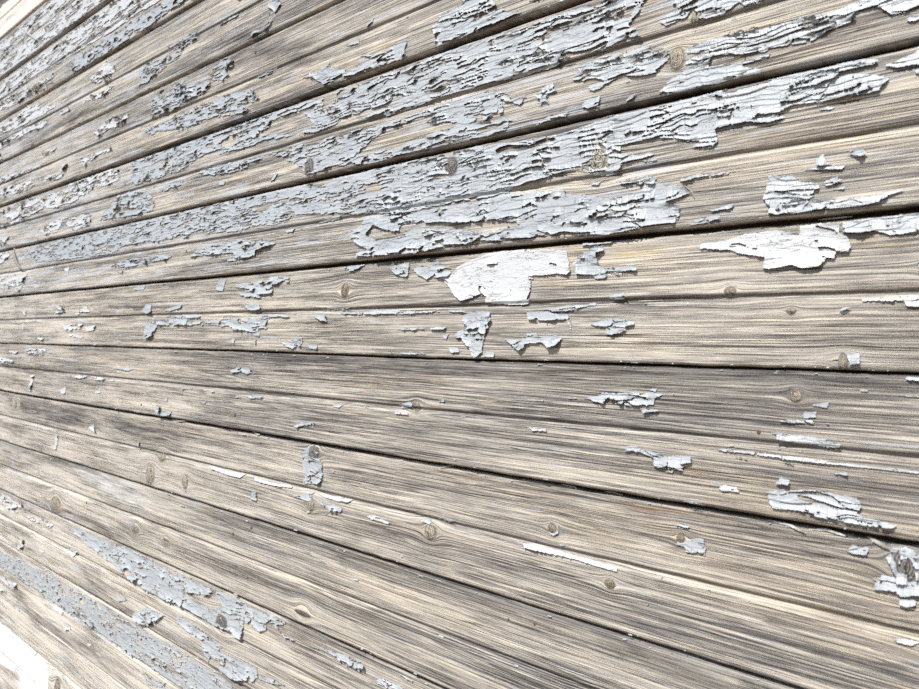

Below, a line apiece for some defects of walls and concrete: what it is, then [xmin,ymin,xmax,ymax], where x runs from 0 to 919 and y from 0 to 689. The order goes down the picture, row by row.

peeling [0,0,919,358]
peeling [0,337,46,364]
peeling [75,367,134,394]
peeling [569,388,662,414]
peeling [845,352,860,364]
peeling [774,402,841,448]
peeling [209,445,353,513]
peeling [767,476,896,528]
peeling [846,545,869,555]
peeling [873,547,919,608]
peeling [0,527,294,689]
peeling [311,646,363,672]